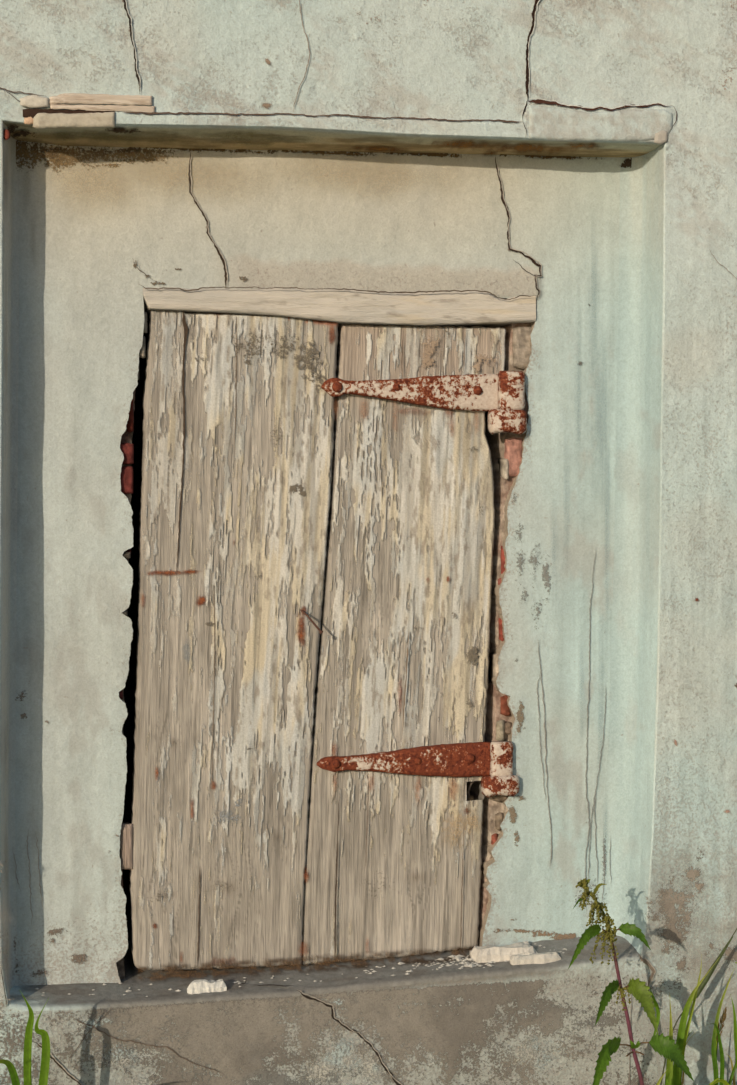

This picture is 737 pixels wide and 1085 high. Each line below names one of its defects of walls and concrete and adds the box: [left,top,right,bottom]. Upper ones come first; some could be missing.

crack [0,87,44,102]
crack [122,0,677,134]
water stain [23,135,605,168]
crack [132,151,542,300]
peeling [120,310,532,939]
crack [33,1008,221,1085]
crack [239,978,403,1085]